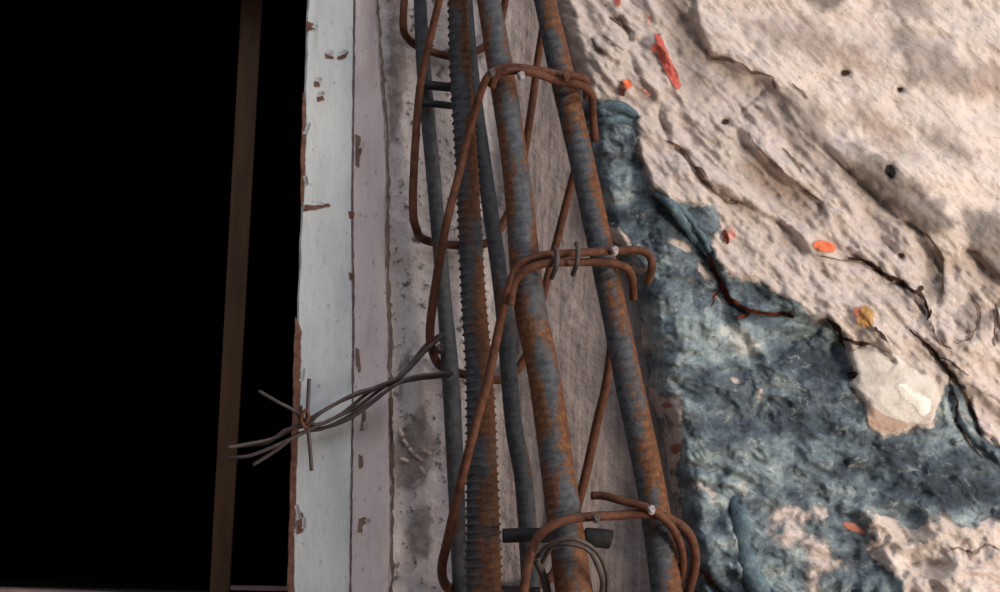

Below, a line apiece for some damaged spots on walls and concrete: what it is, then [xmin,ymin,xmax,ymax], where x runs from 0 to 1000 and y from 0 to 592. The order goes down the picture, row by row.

peeling [325,49,349,60]
spalling [387,0,407,138]
peeling [300,77,330,211]
spalling [355,135,365,168]
crack [708,255,795,319]
spalling [847,345,941,435]
spalling [394,409,437,488]
spalling [358,517,371,533]
spalling [408,509,430,555]